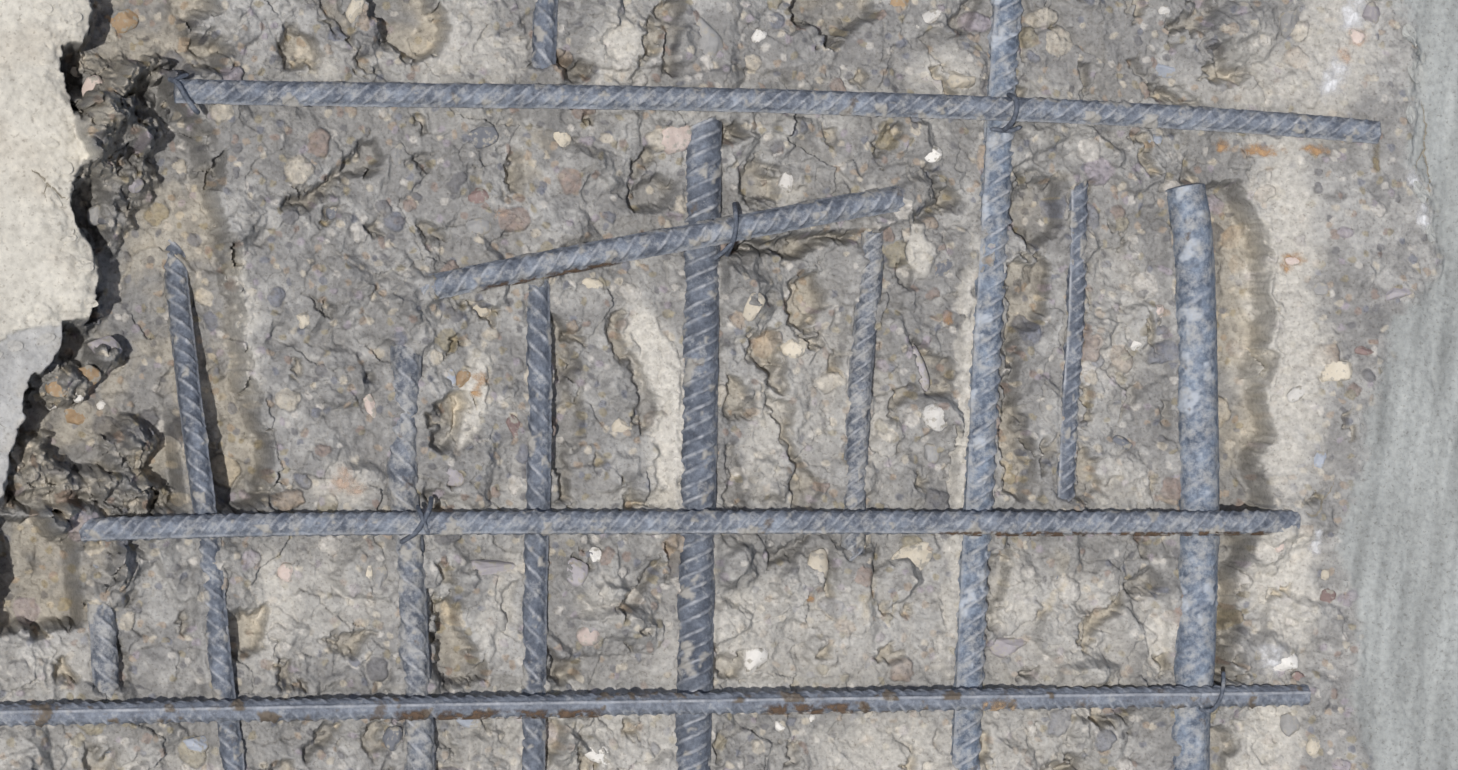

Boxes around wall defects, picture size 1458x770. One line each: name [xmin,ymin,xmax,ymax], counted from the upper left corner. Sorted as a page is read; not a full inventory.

spalling [0,0,1014,705]
spalling [0,685,1221,770]
spalling [392,0,1441,770]